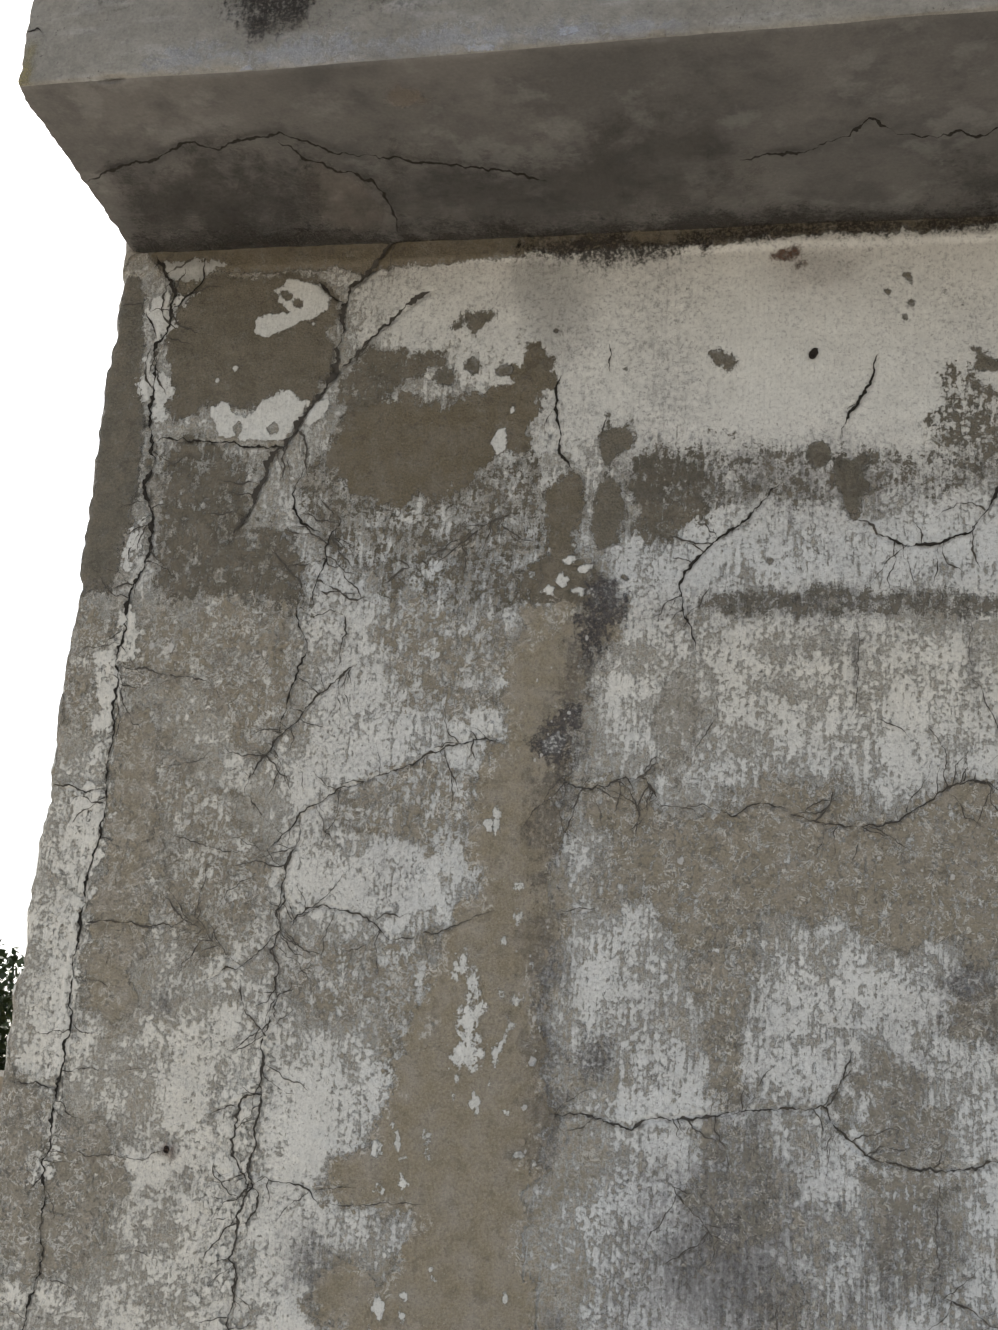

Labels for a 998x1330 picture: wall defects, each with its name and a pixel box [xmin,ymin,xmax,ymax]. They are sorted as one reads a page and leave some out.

leakage [221,0,318,48]
crack [544,377,572,469]
crack [644,485,779,649]
crack [849,486,998,619]
crack [0,131,546,1330]
peeling [57,216,998,1330]
crack [528,614,998,864]
crack [553,1052,998,1330]